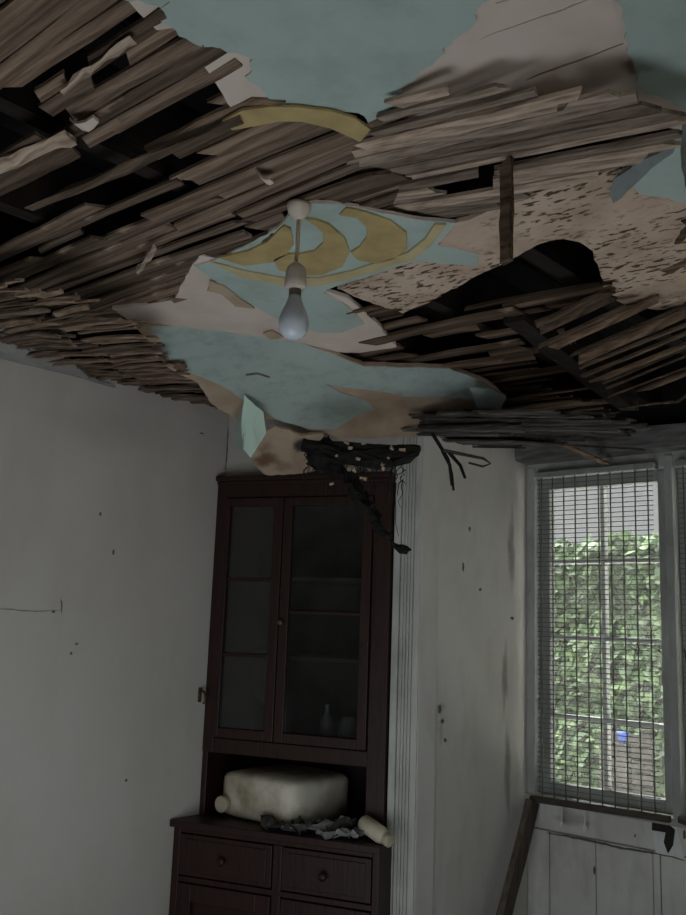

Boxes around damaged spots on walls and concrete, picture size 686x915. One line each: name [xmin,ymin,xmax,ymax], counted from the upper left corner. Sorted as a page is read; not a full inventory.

peeling [130,0,158,18]
peeling [205,53,267,107]
peeling [402,0,686,116]
spalling [513,124,686,310]
spalling [0,202,501,409]
peeling [234,395,266,458]